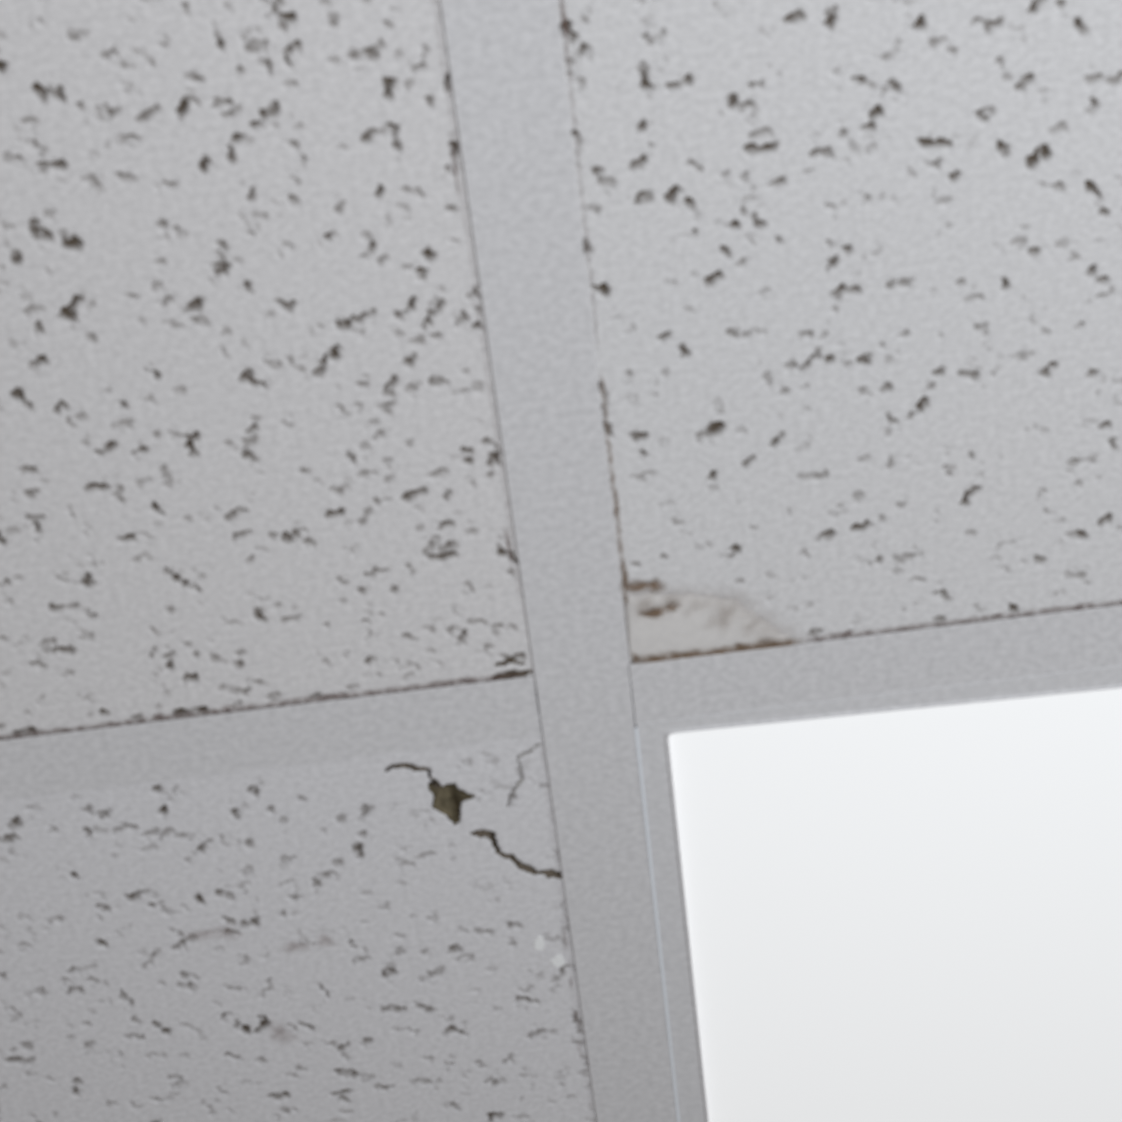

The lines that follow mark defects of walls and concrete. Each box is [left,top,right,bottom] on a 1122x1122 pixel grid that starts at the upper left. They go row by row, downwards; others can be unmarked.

damp [634,641,793,663]
crack [508,743,543,809]
crack [385,763,562,879]